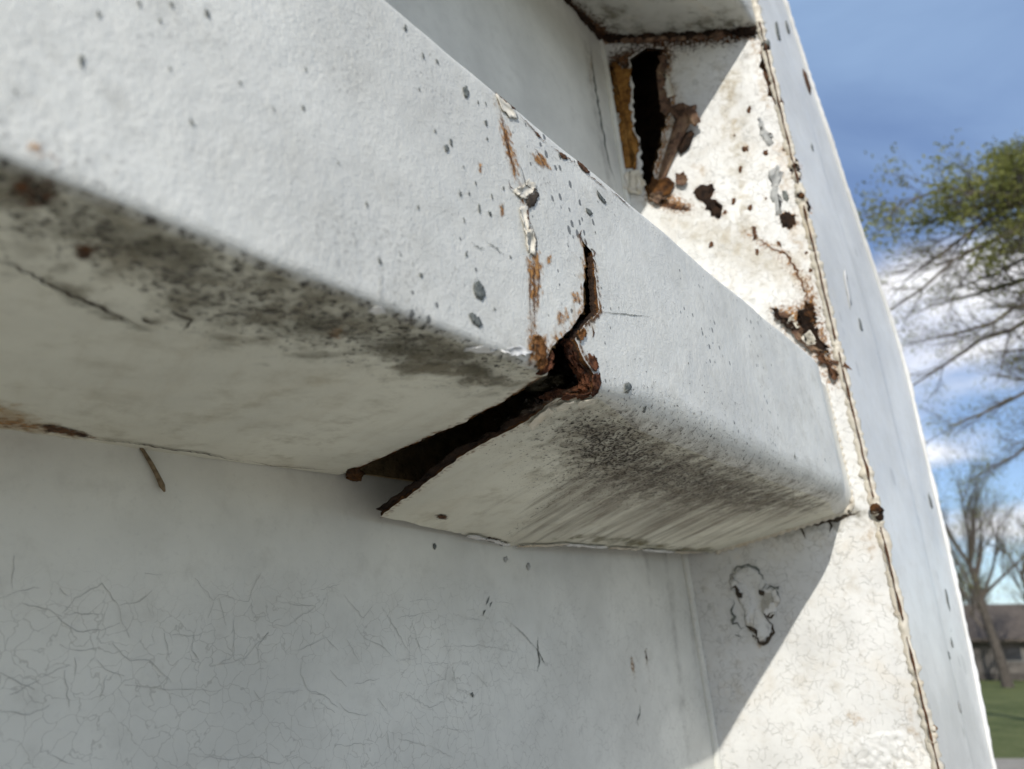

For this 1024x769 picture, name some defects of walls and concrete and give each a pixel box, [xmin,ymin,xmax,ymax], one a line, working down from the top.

peeling [658,54,674,98]
peeling [634,173,646,192]
peeling [675,171,736,218]
peeling [768,165,812,230]
water stain [0,158,537,387]
rust [513,243,602,402]
rust [0,408,87,438]
water stain [484,355,841,520]
peeling [729,564,781,646]
crack [0,556,544,769]